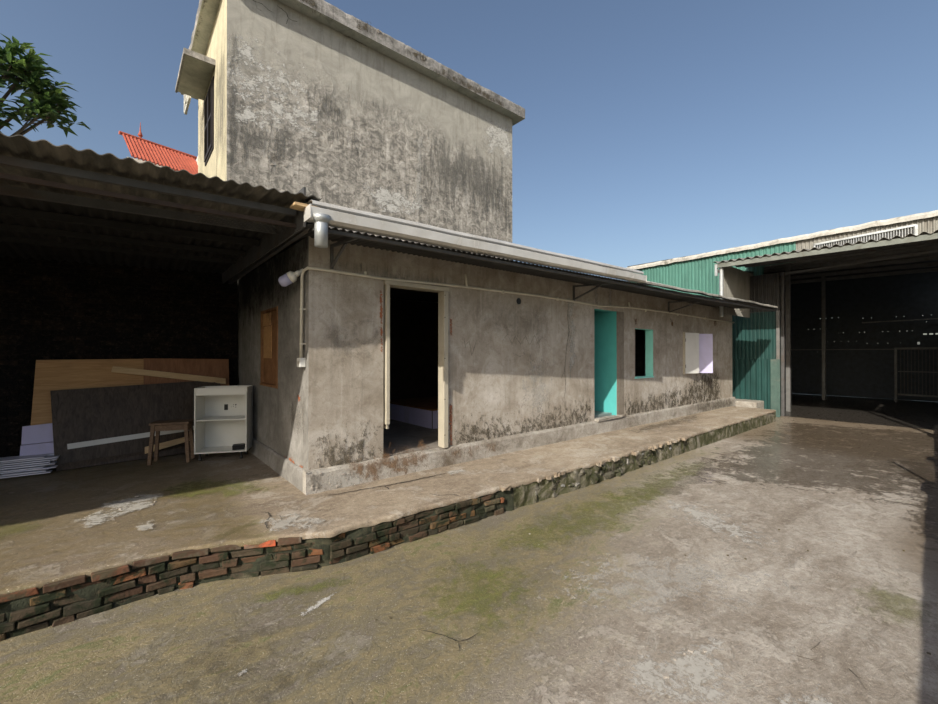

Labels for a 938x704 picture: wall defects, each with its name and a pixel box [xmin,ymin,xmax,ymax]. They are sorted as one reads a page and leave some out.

damp [218,75,284,161]
damp [413,133,507,221]
damp [625,373,720,415]
damp [316,420,380,467]
damp [449,398,595,447]